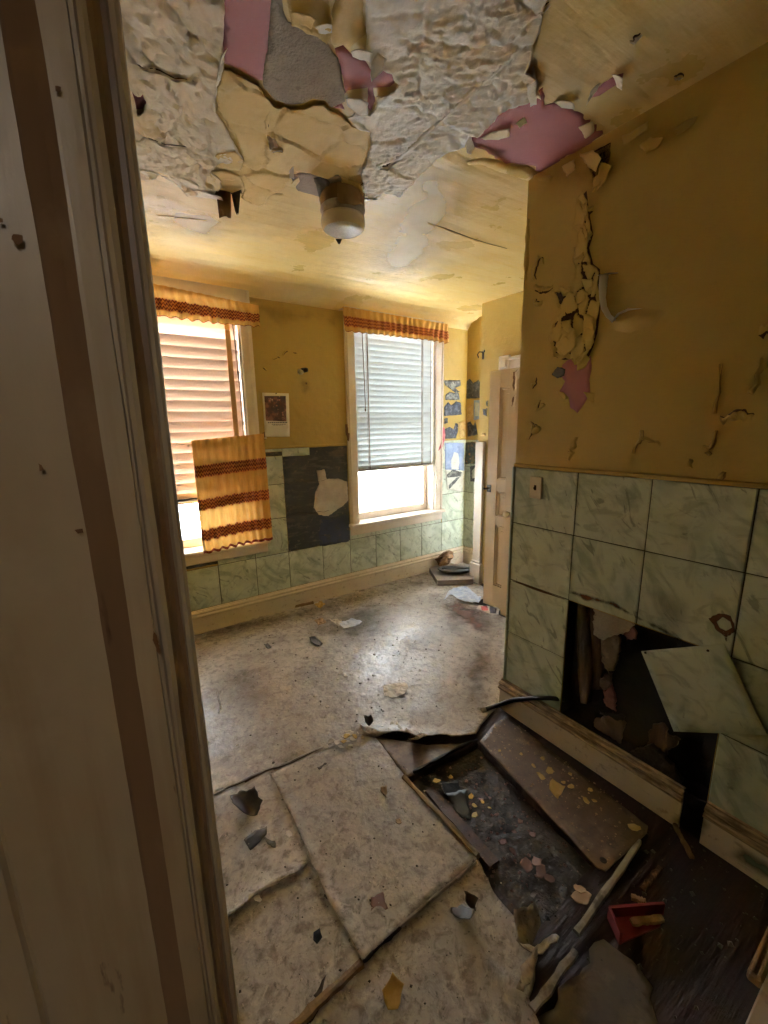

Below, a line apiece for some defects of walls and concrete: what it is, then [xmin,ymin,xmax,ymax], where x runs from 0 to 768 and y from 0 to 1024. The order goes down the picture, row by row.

peeling [120,0,663,413]
crack [424,219,553,307]
peeling [282,424,350,551]
spalling [569,604,718,788]
crack [213,747,323,795]
peeling [549,778,565,799]